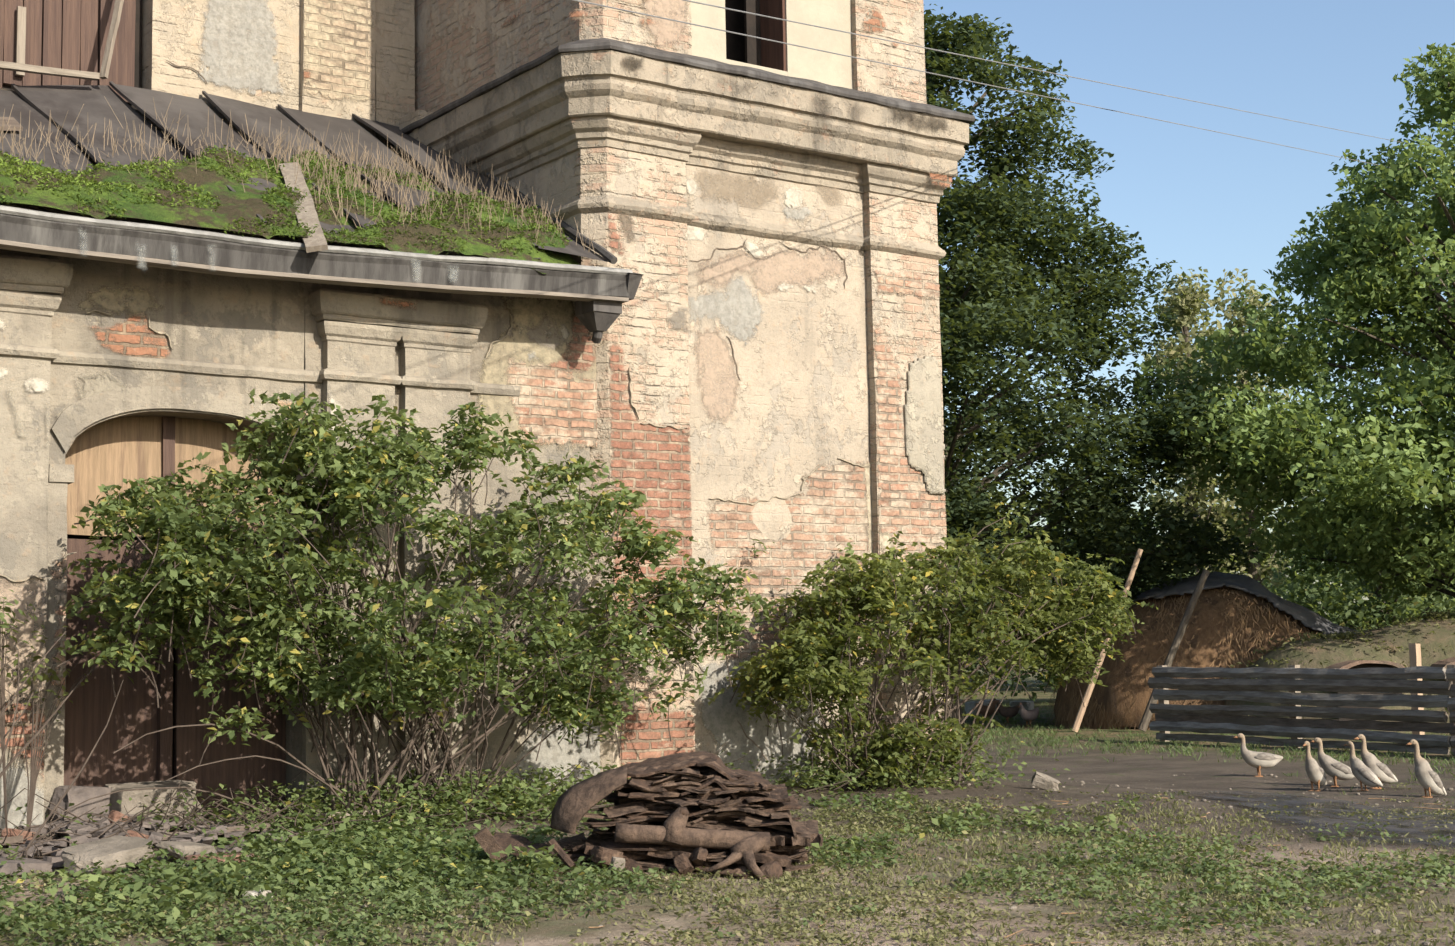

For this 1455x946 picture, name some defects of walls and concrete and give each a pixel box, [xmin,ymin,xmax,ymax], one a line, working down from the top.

spalling [608,214,635,254]
flaking render [875,270,940,299]
flaking render [78,286,173,359]
flaking render [474,296,948,661]